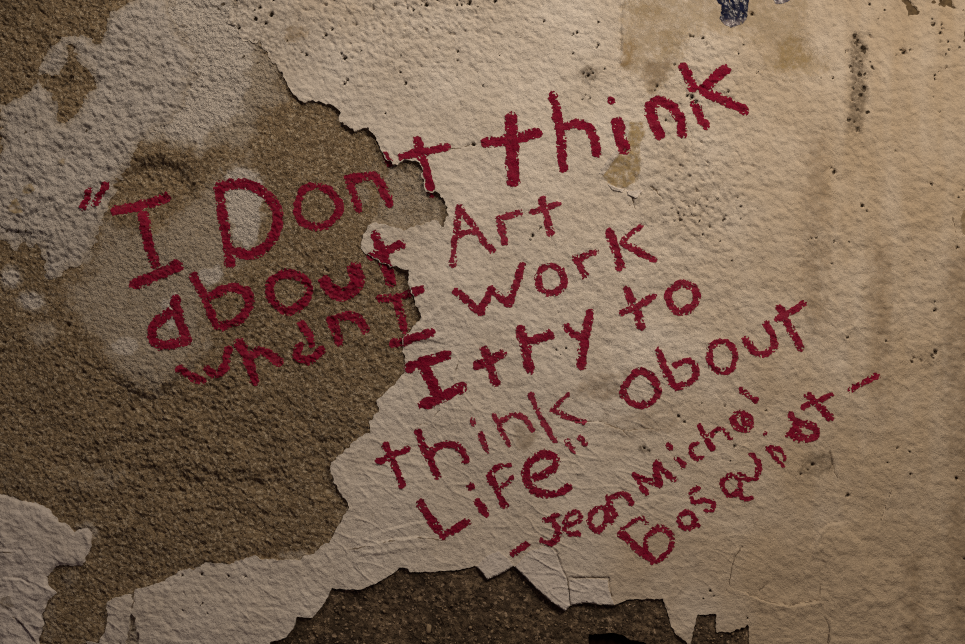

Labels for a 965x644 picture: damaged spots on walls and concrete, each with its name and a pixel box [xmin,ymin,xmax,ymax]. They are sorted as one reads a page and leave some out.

spalling [902,0,920,16]
spalling [931,0,964,11]
peeling [599,122,644,198]
spalling [0,0,449,644]
spalling [270,546,749,644]